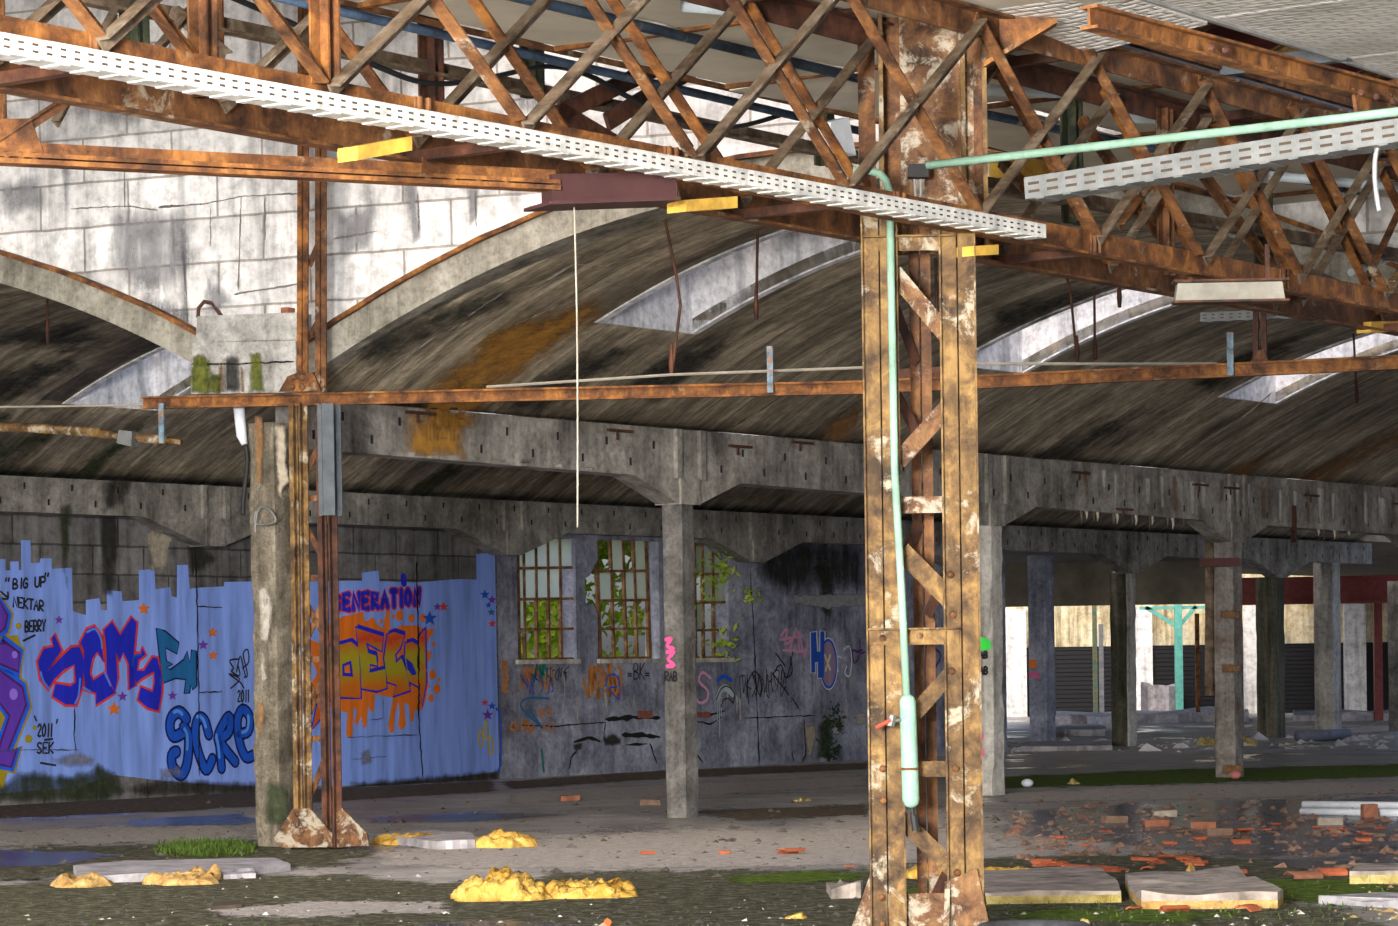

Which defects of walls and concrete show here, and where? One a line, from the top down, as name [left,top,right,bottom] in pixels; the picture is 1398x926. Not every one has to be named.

water stain [519,96,538,108]
water stain [3,183,40,209]
water stain [342,209,372,251]
water stain [407,186,419,240]
water stain [469,189,477,221]
water stain [118,215,189,323]
water stain [209,286,227,310]
corrosion [410,307,598,457]